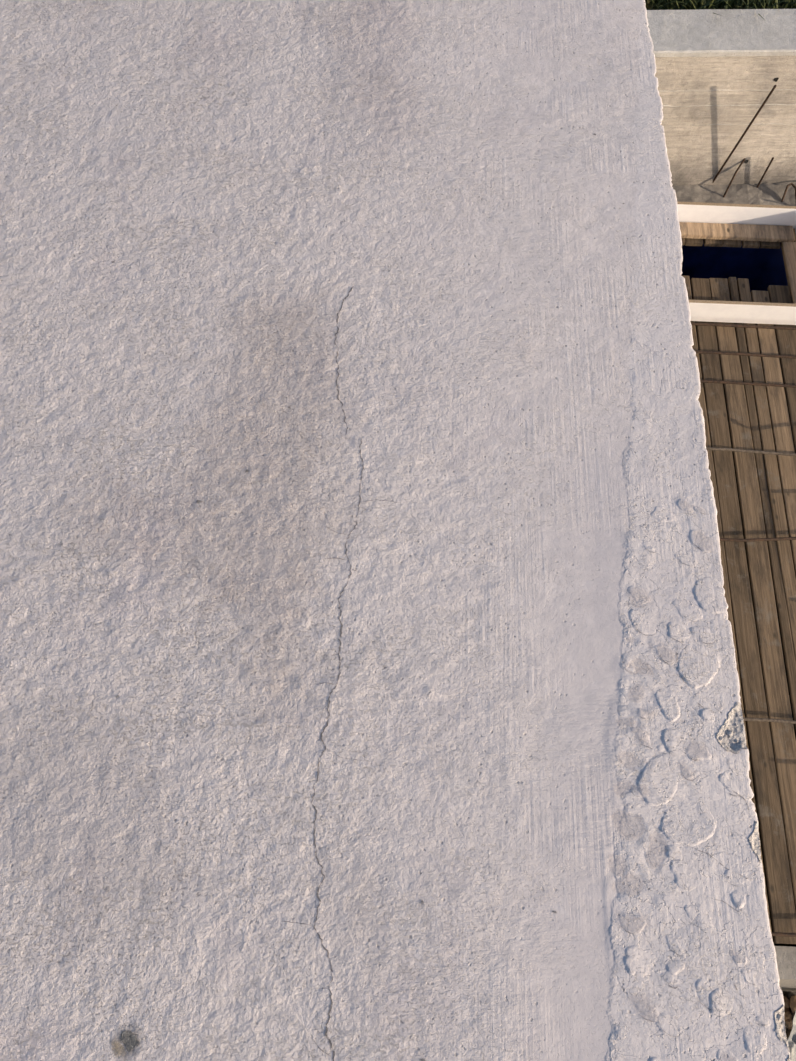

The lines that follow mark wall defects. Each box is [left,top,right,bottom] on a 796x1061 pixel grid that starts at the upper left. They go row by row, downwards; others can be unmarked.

crack [311,287,364,1061]